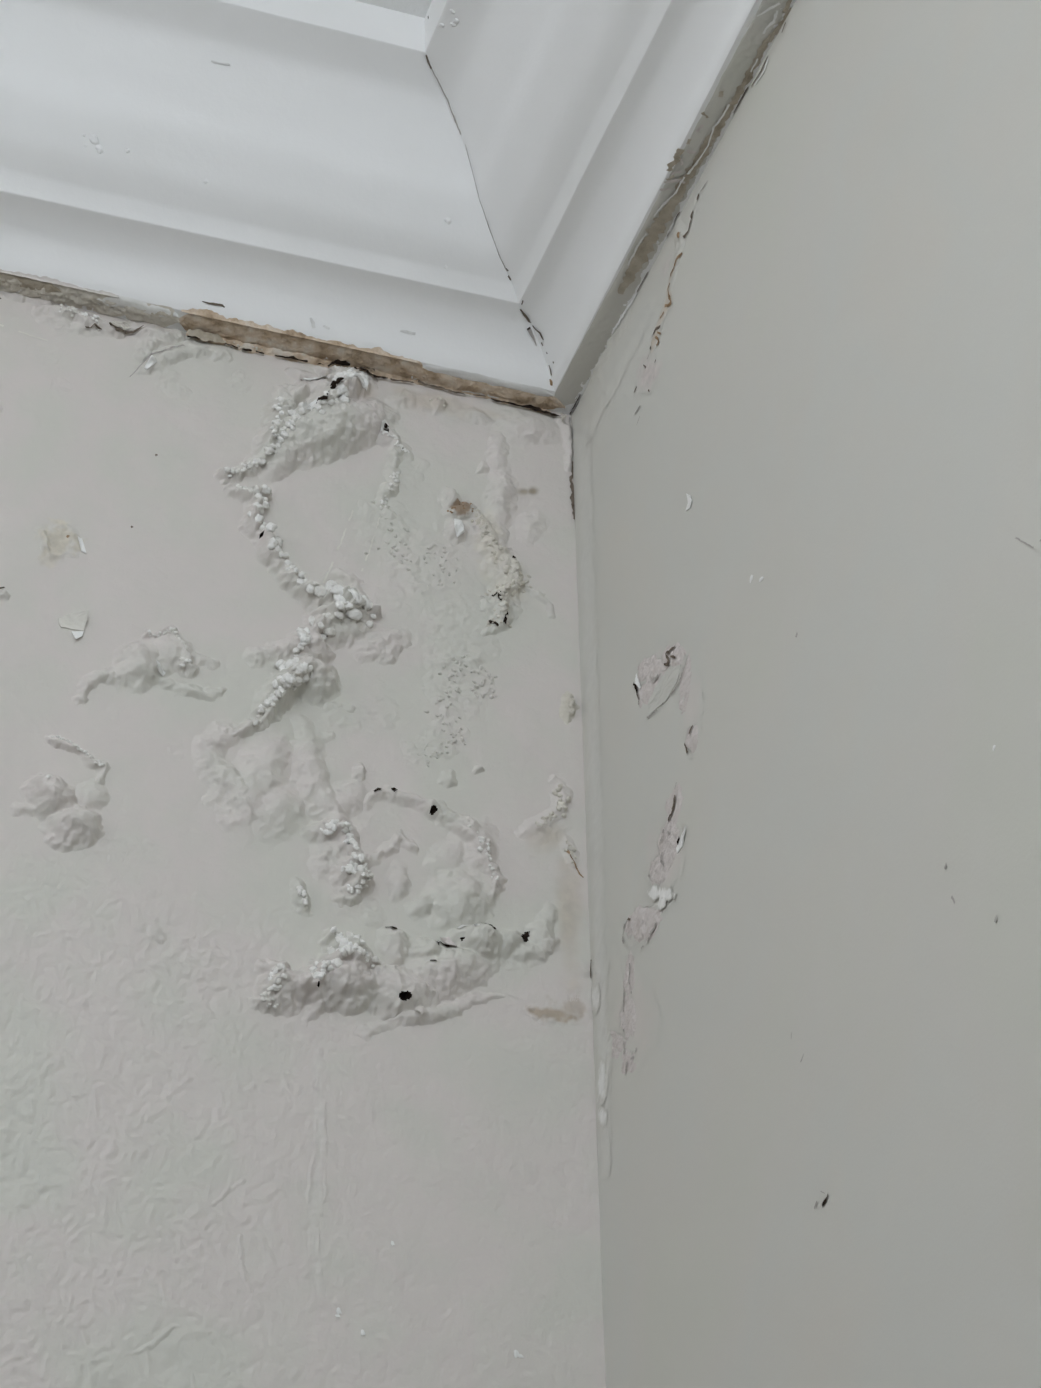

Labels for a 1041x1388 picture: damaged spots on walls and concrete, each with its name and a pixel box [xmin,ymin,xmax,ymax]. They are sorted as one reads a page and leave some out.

peeling [0,0,792,416]
crack [425,55,580,519]
peeling [622,782,686,949]
peeling [633,642,698,753]